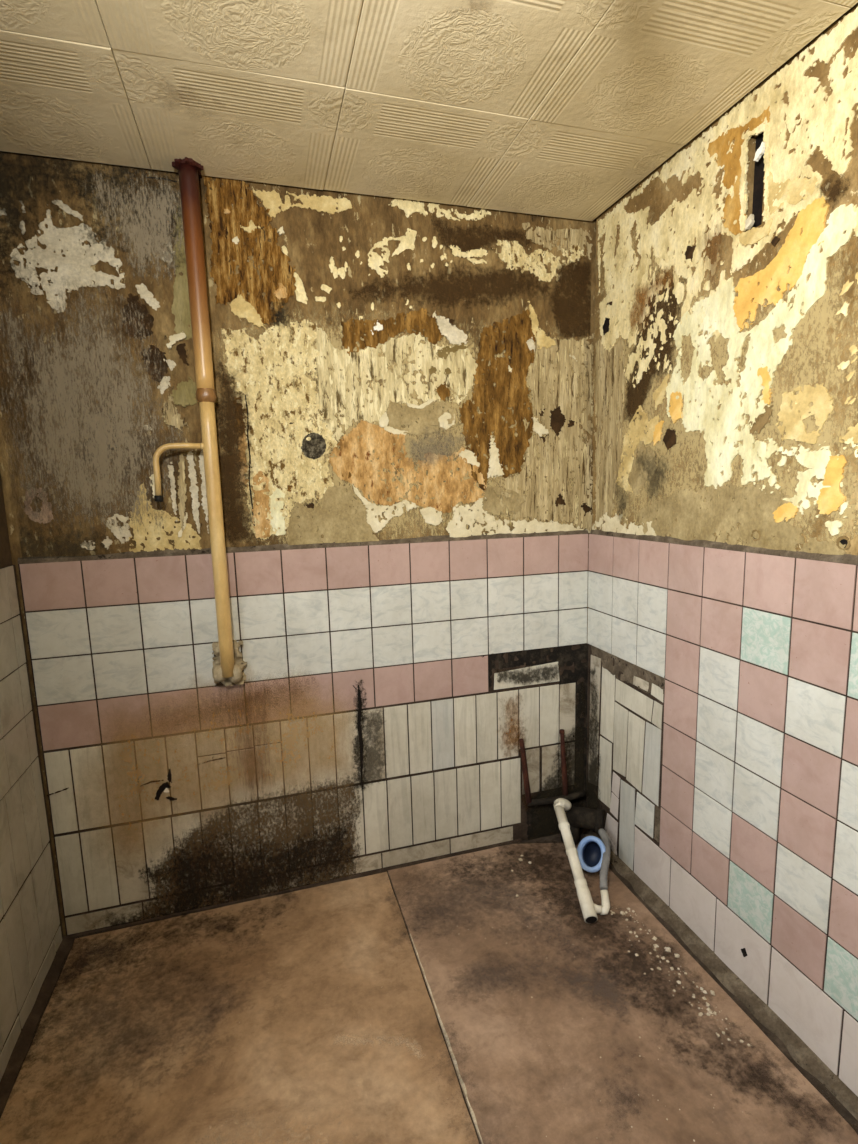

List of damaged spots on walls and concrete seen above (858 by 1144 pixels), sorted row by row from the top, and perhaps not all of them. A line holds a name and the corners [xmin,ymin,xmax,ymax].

flaking render [10,199,197,431]
peeling [221,7,858,555]
peeling [23,487,53,524]
flaking render [80,483,202,552]
leakage [353,680,384,789]
rust [502,700,520,755]
peeling [481,644,665,840]
leakage [23,913,238,1084]